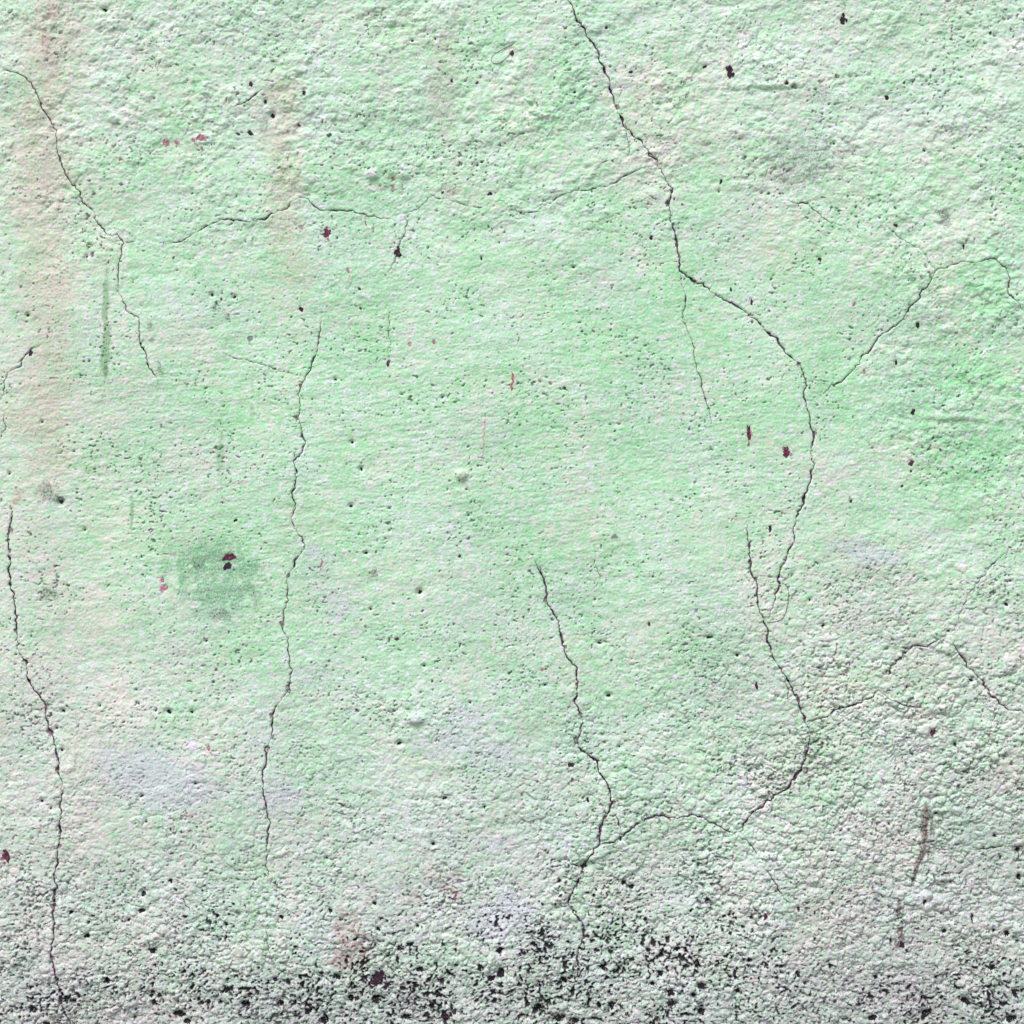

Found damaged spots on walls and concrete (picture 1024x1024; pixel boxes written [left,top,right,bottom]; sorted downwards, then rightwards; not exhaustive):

crack [7,70,157,378]
crack [168,197,389,244]
crack [7,511,71,1024]
crack [232,323,321,874]
water stain [0,879,1024,1024]
crack [391,0,1024,986]